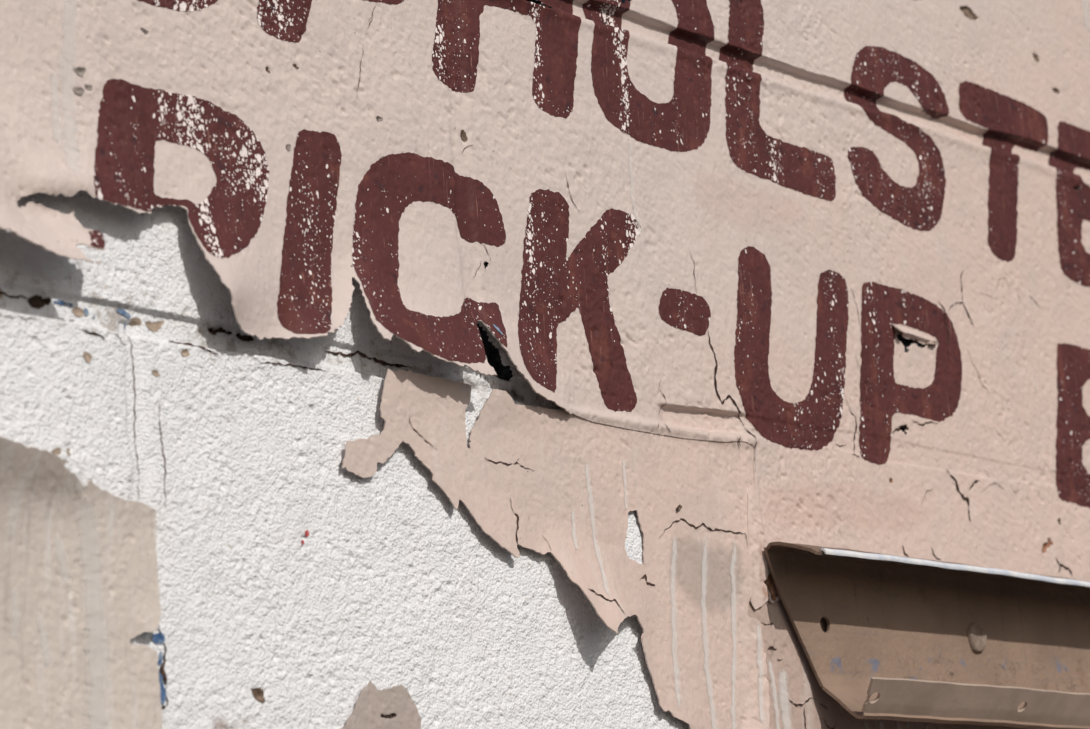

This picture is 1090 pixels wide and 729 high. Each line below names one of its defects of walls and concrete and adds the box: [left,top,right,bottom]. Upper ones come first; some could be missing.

crack [0,292,34,319]
crack [169,340,218,354]
crack [253,350,412,372]
peeling [892,323,939,352]
crack [708,329,757,448]
peeling [0,124,778,729]
crack [922,469,1018,522]
crack [661,518,748,544]